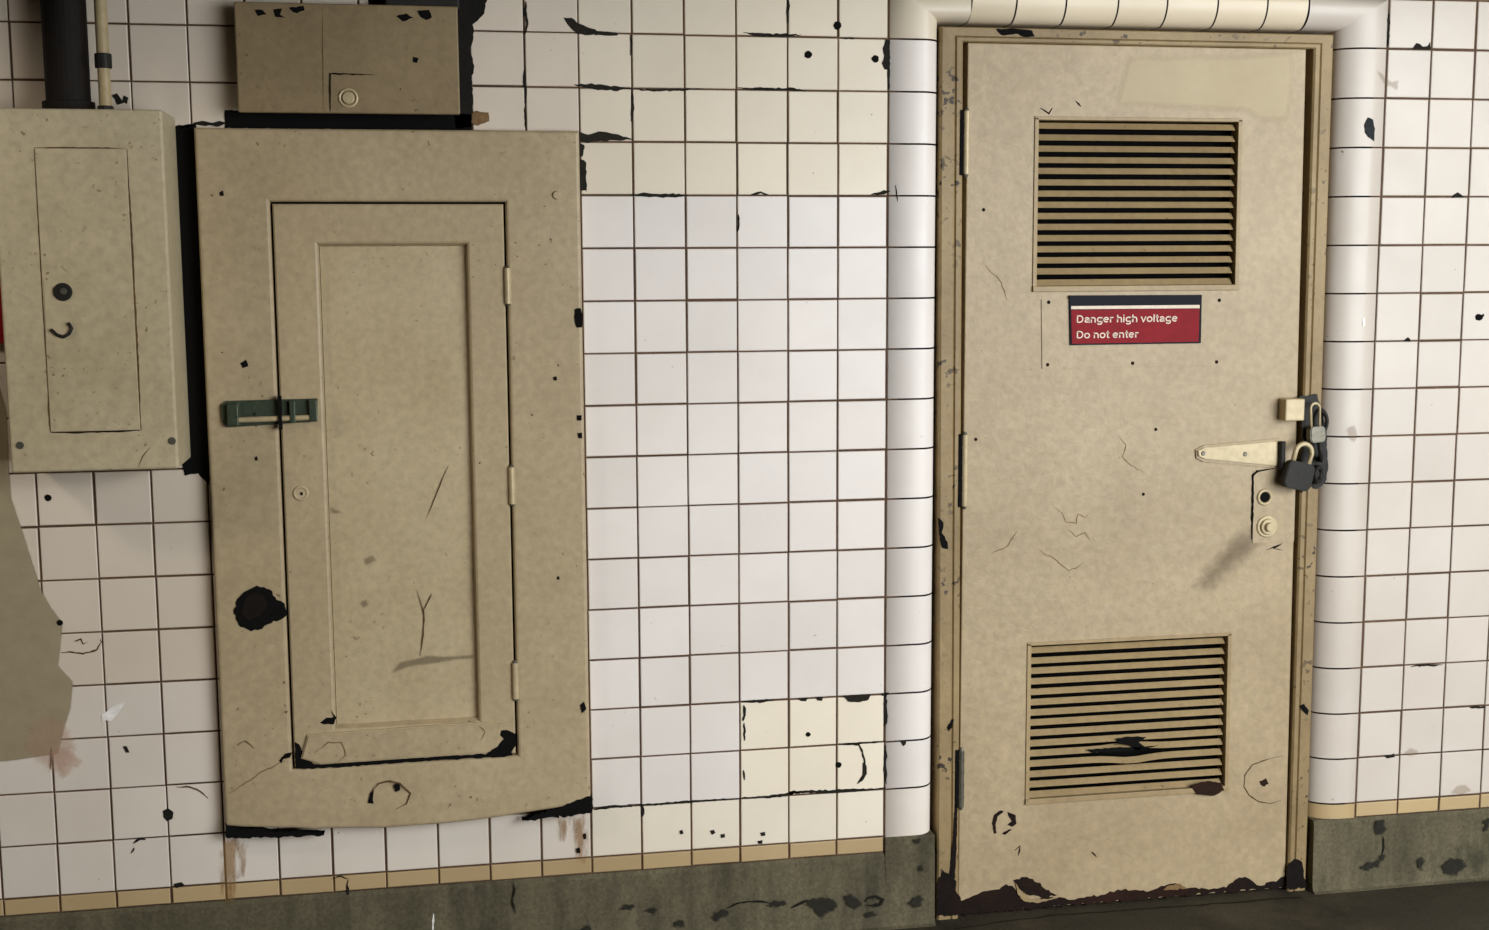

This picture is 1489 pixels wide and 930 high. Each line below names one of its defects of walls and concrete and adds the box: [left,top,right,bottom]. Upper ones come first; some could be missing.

peeling [564,18,618,36]
spalling [882,40,890,89]
spalling [579,131,633,191]
spalling [843,694,871,702]
spalling [1374,819,1387,835]
spalling [1360,855,1385,871]
spalling [1416,857,1467,875]
spalling [712,894,885,921]
spalling [907,895,923,908]